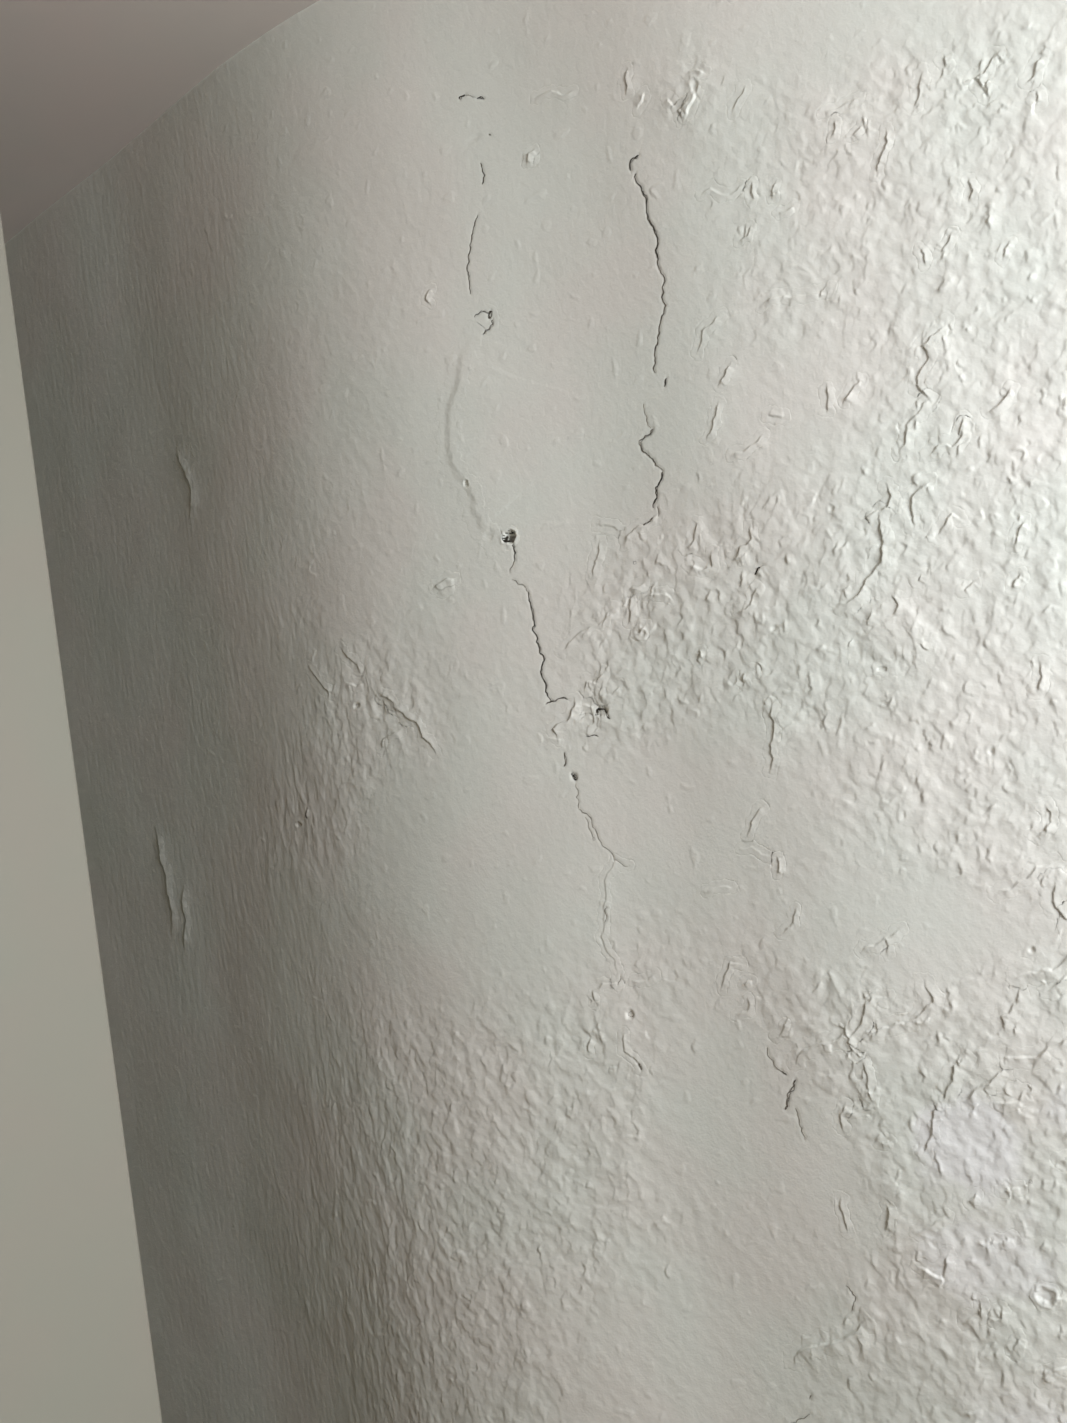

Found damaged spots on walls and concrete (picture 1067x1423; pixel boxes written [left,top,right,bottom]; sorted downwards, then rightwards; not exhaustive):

peeling [617,61,712,128]
peeling [816,91,895,183]
peeling [902,45,1007,116]
crack [466,134,493,334]
crack [629,155,667,525]
peeling [828,312,1021,617]
flaking render [303,639,442,759]
crack [510,544,662,1077]
peeling [761,696,782,779]
peeling [768,972,945,1138]
peeling [872,796,1067,1166]
peeling [876,1178,1028,1288]